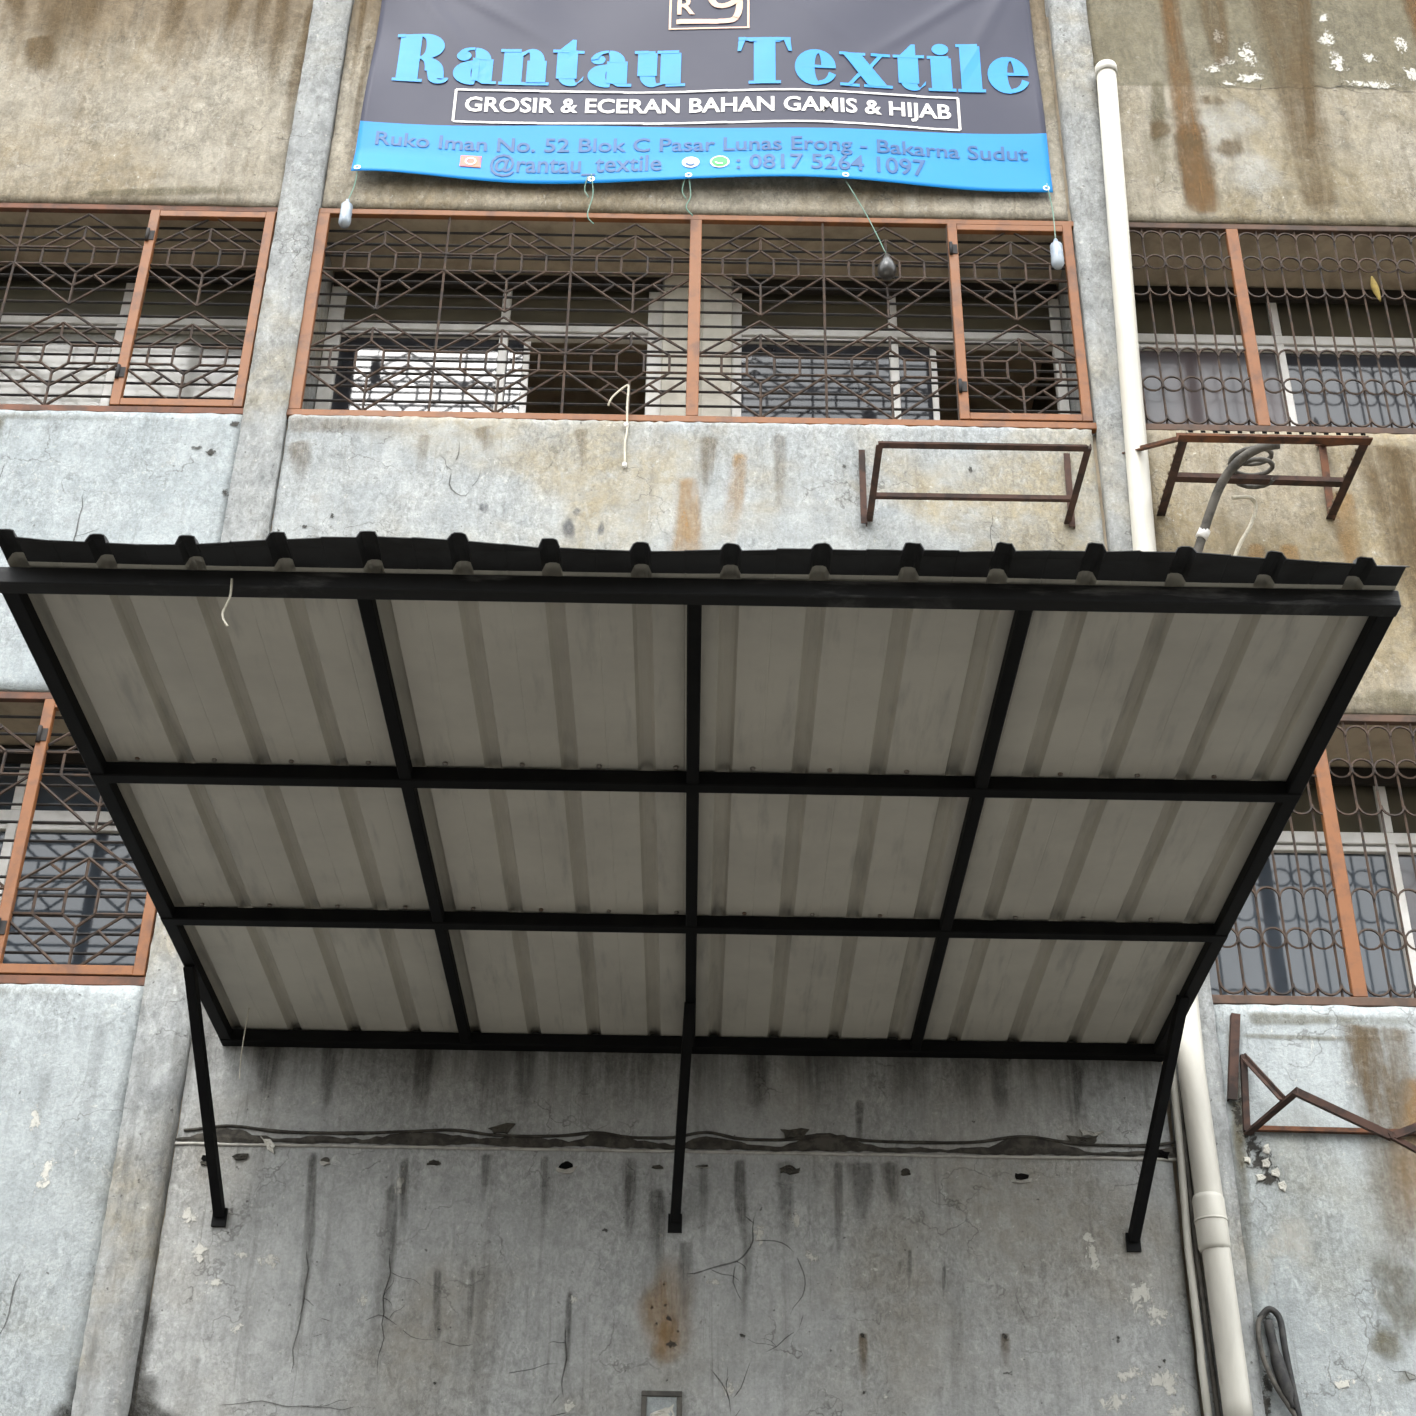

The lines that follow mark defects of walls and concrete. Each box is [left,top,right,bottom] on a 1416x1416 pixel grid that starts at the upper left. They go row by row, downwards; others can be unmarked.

damp [27,0,98,66]
damp [291,9,312,95]
corrosion [1161,0,1215,211]
peeling [1204,29,1264,85]
peeling [1317,14,1416,89]
corrosion [1348,1025,1416,1187]
crack [292,1256,329,1368]
crack [367,1257,468,1367]
crack [690,1219,806,1415]
crack [226,1400,352,1410]